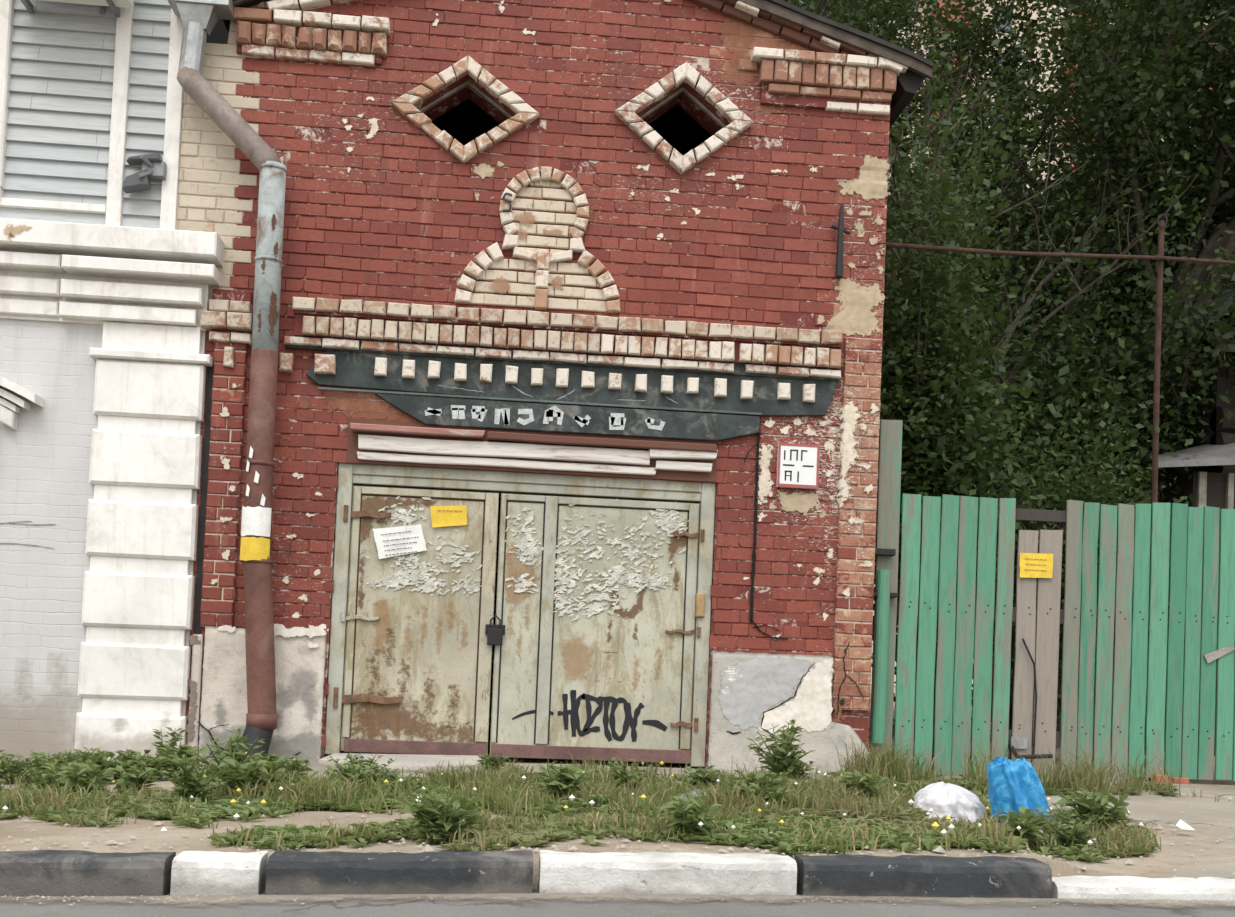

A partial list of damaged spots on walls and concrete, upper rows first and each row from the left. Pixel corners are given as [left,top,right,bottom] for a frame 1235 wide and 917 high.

corrosion [4,224,32,242]
peeling [816,155,891,337]
corrosion [608,587,647,642]
corrosion [346,628,475,743]
spalling [759,656,867,735]